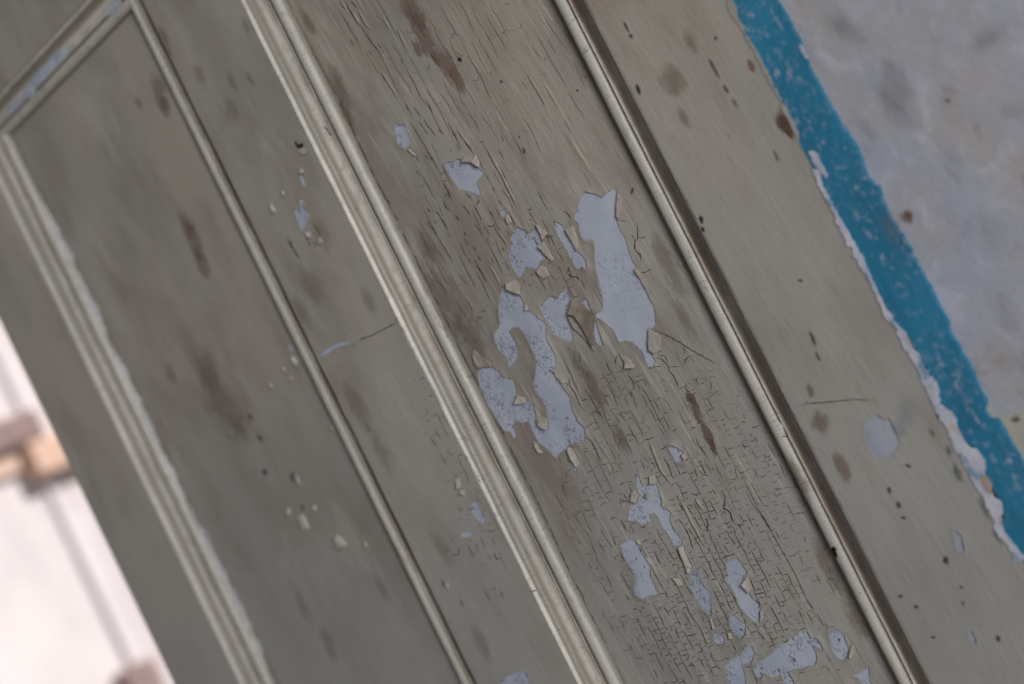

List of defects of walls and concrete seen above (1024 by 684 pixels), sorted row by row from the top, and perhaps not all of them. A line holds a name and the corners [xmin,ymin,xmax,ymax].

peeling [444,154,484,195]
peeling [726,0,800,140]
peeling [472,189,662,471]
crack [295,0,840,684]
peeling [809,151,1024,562]
peeling [621,540,659,599]
peeling [628,475,854,684]